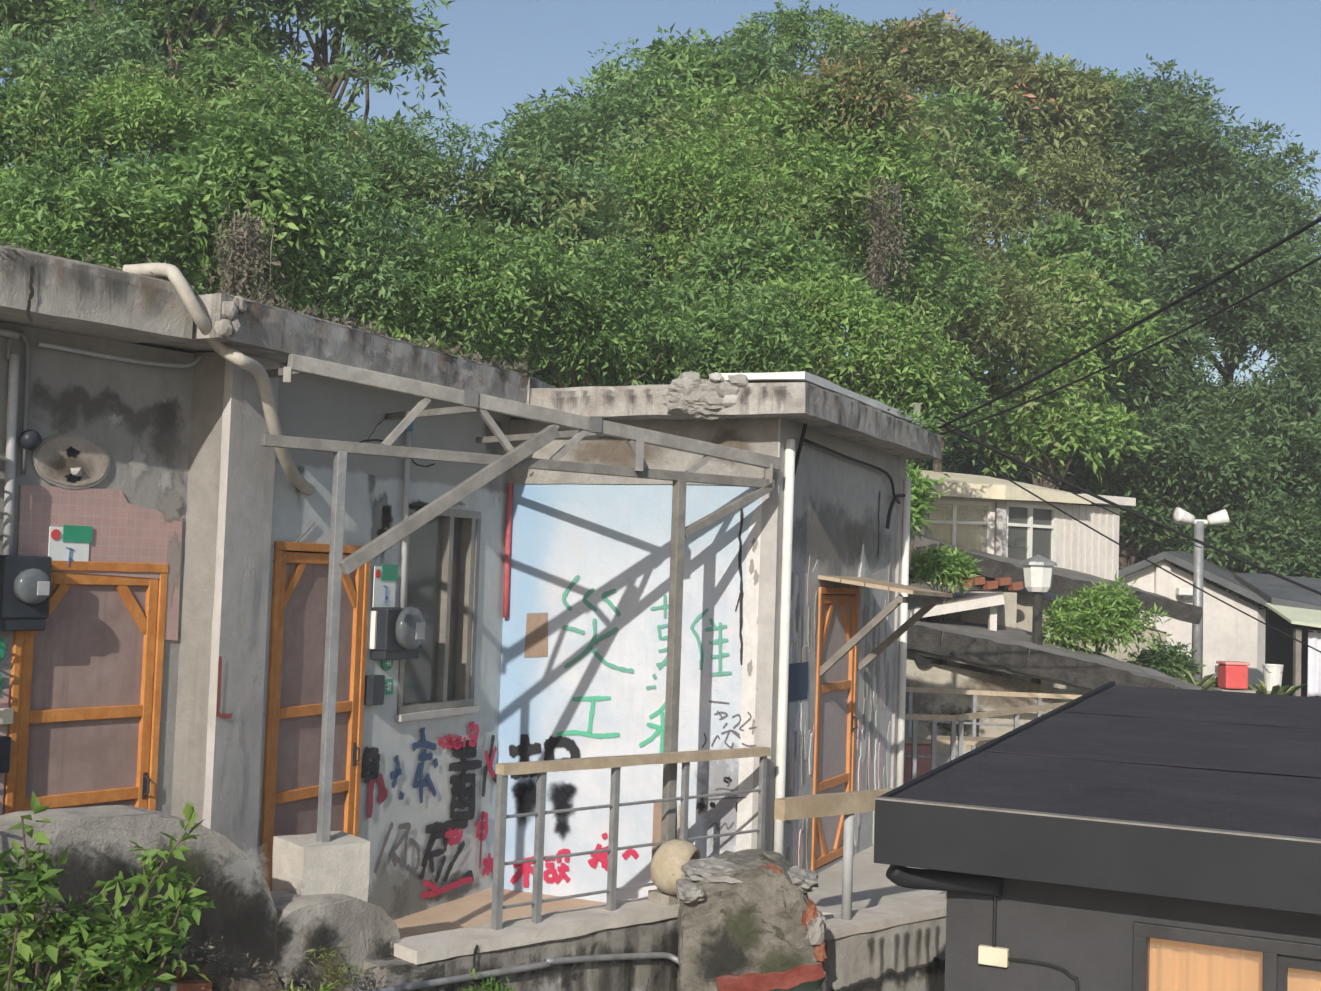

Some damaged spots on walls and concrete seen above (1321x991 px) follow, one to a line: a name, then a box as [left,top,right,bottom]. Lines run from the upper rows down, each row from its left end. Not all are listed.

crack [26,266,34,323]
leakage [1,249,160,305]
leakage [34,384,176,459]
spalling [661,371,749,420]
flaking render [129,444,148,484]
flaking render [158,474,182,606]
crack [735,509,744,665]